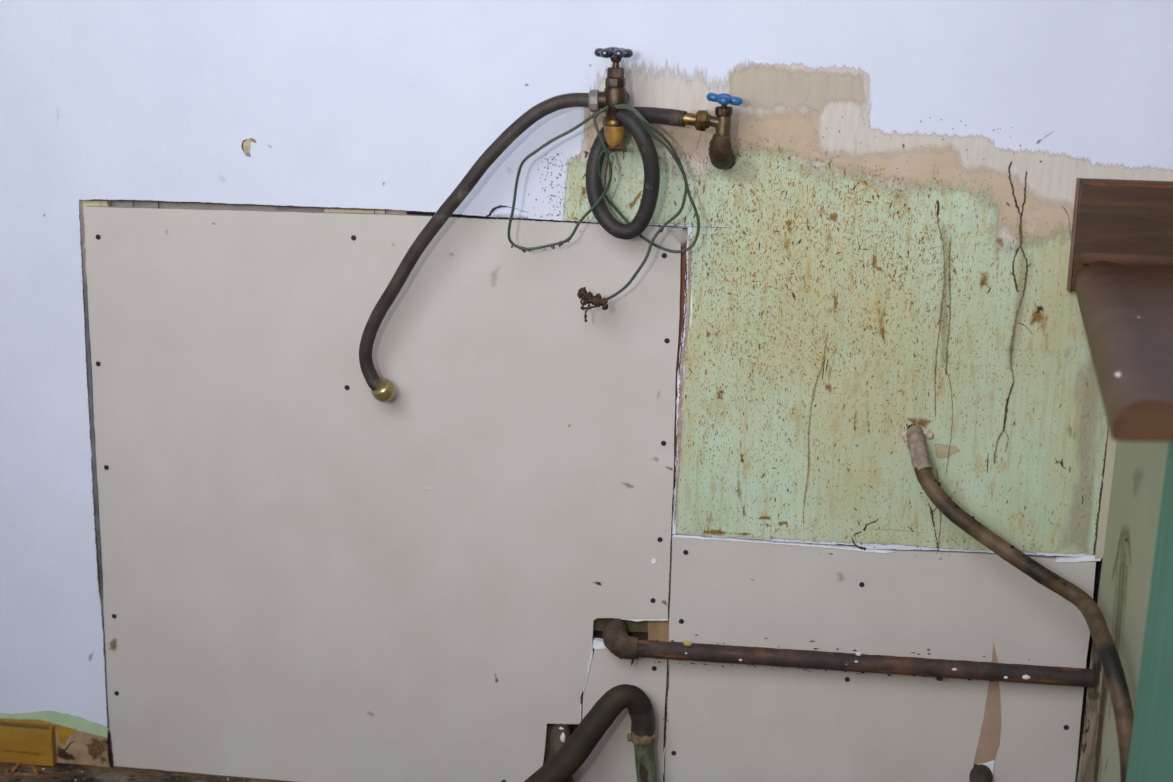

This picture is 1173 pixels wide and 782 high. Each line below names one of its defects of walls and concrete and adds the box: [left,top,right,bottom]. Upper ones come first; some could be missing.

rust [528,134,594,232]
peeling [563,107,606,222]
rust [601,138,644,221]
rust [653,116,1105,563]
peeling [590,60,1173,604]
crack [987,162,1032,473]
spalling [618,572,671,640]
leakage [1080,646,1108,782]